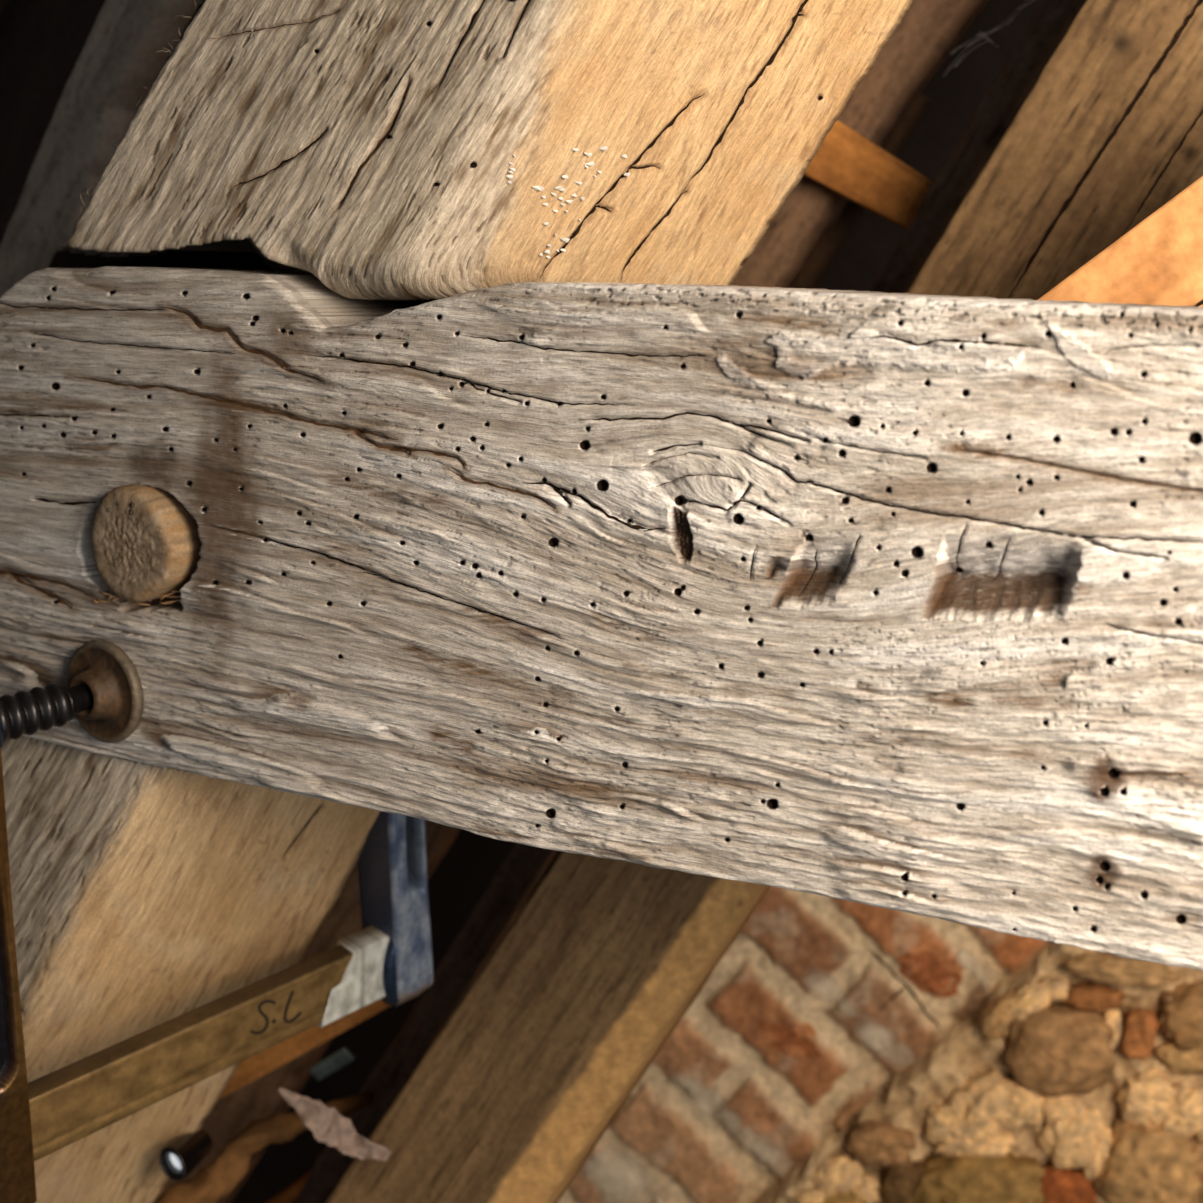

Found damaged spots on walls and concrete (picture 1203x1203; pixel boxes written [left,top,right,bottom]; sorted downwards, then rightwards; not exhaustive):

crack [541,93,705,276]
crack [621,0,809,279]
crack [0,303,1203,560]